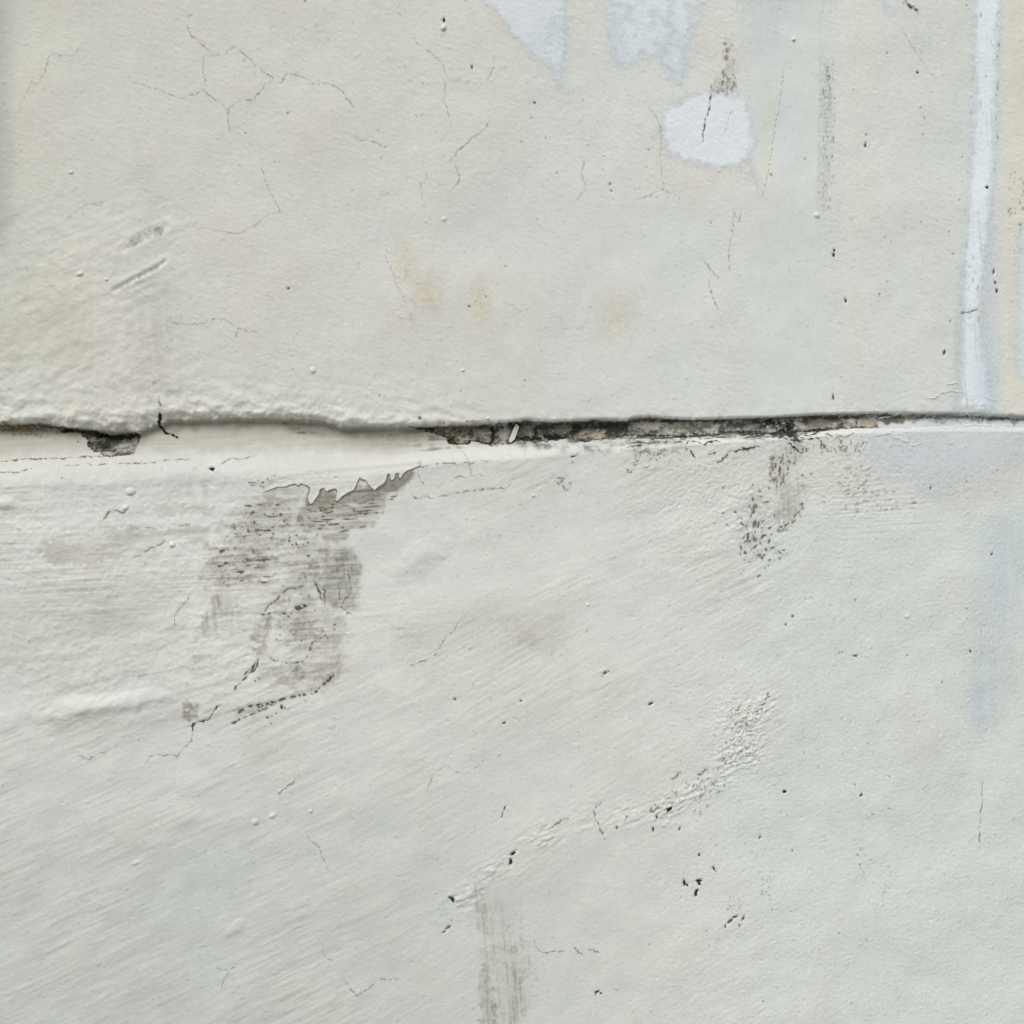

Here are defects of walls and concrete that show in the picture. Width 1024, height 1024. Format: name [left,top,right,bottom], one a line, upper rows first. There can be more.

spalling [0,424,141,456]
crack [2,401,189,473]
crack [631,415,1021,462]
leakage [307,472,412,505]